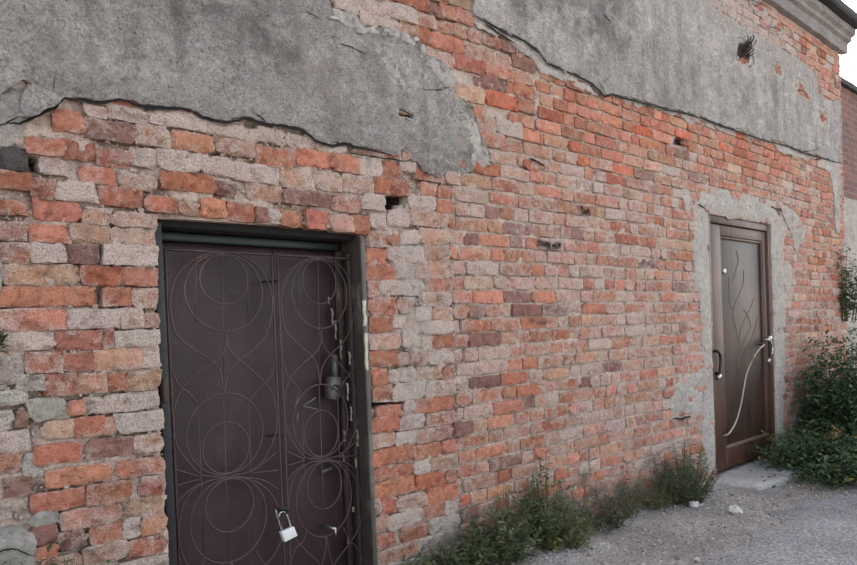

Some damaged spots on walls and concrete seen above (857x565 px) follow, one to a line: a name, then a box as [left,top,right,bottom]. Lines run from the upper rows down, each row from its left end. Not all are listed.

flaking render [16,84,64,118]
crack [0,73,419,162]
flaking render [329,8,495,178]
flaking render [474,17,599,96]
crack [471,0,841,164]
spalling [736,35,757,69]
spalling [523,158,544,172]
flaking render [611,93,843,233]
hole [385,196,406,210]
flaking render [776,202,806,252]
peeling [328,297,351,365]